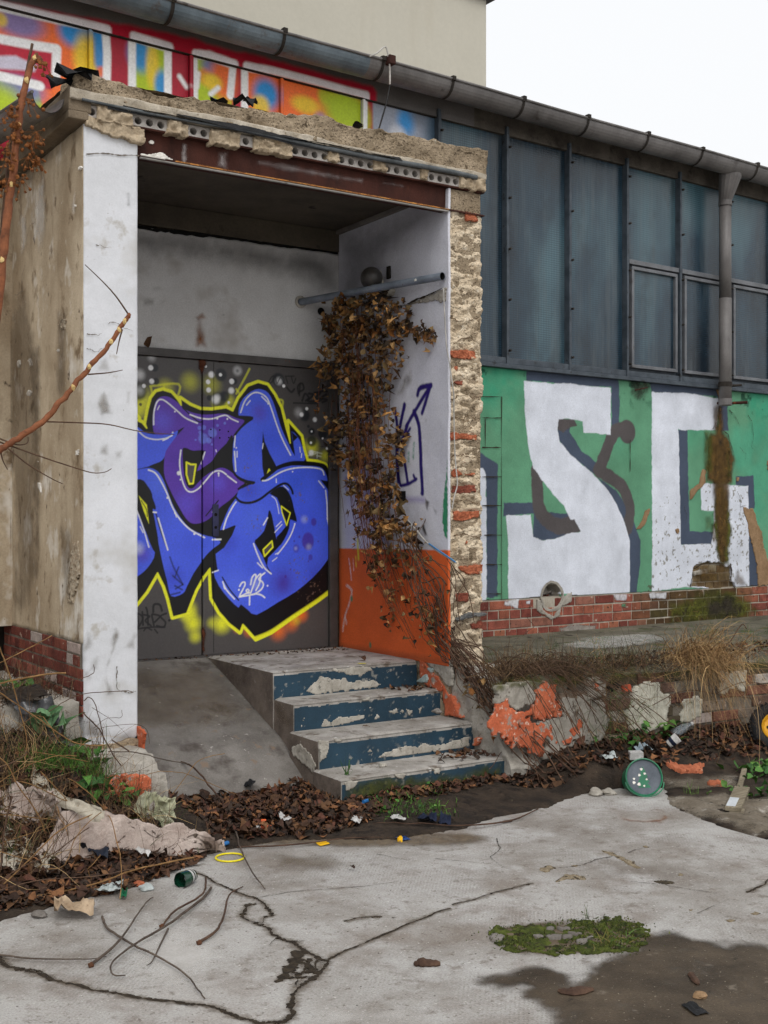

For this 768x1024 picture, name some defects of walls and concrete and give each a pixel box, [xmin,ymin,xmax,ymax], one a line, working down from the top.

spalling [141,152,173,160]
flaking render [450,350,476,385]
peeling [690,469,706,500]
peeling [743,507,768,587]
spalling [691,561,733,589]
flaking render [718,670,747,694]
peeling [292,666,422,773]
flaking render [368,659,703,777]
crack [0,838,531,1024]